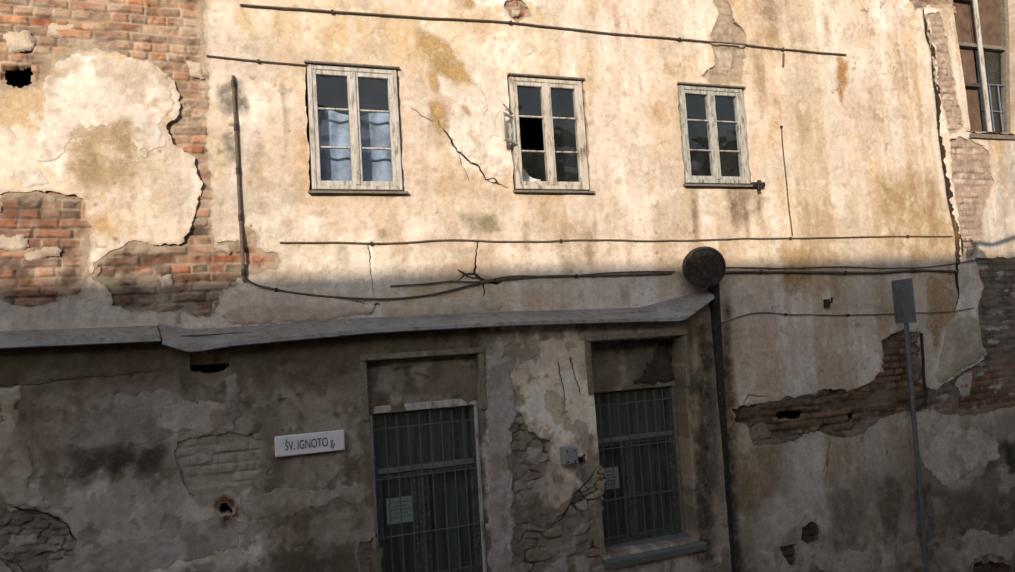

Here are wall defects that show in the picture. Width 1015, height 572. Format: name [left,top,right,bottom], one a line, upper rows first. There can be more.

flaking render [702,0,745,89]
flaking render [0,0,280,317]
crack [411,107,505,187]
flaking render [731,0,1015,486]
peeling [67,363,242,453]
peeling [0,385,367,572]
peeling [485,354,517,572]
flaking render [357,533,383,572]
peeling [779,522,882,572]
peeling [956,528,1015,572]